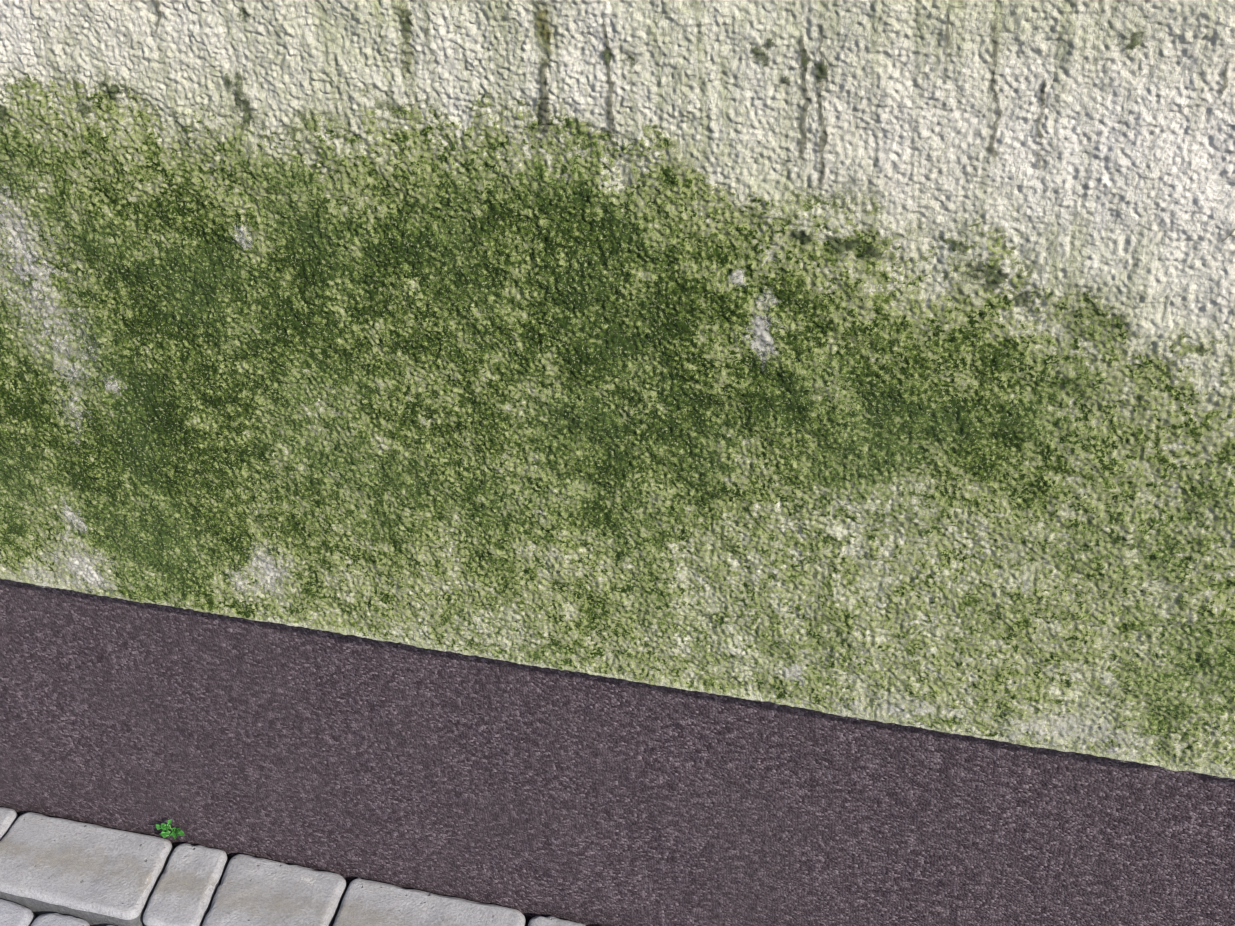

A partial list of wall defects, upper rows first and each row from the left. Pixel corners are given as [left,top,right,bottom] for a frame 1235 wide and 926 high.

leakage [540,63,550,134]
leakage [799,24,829,185]